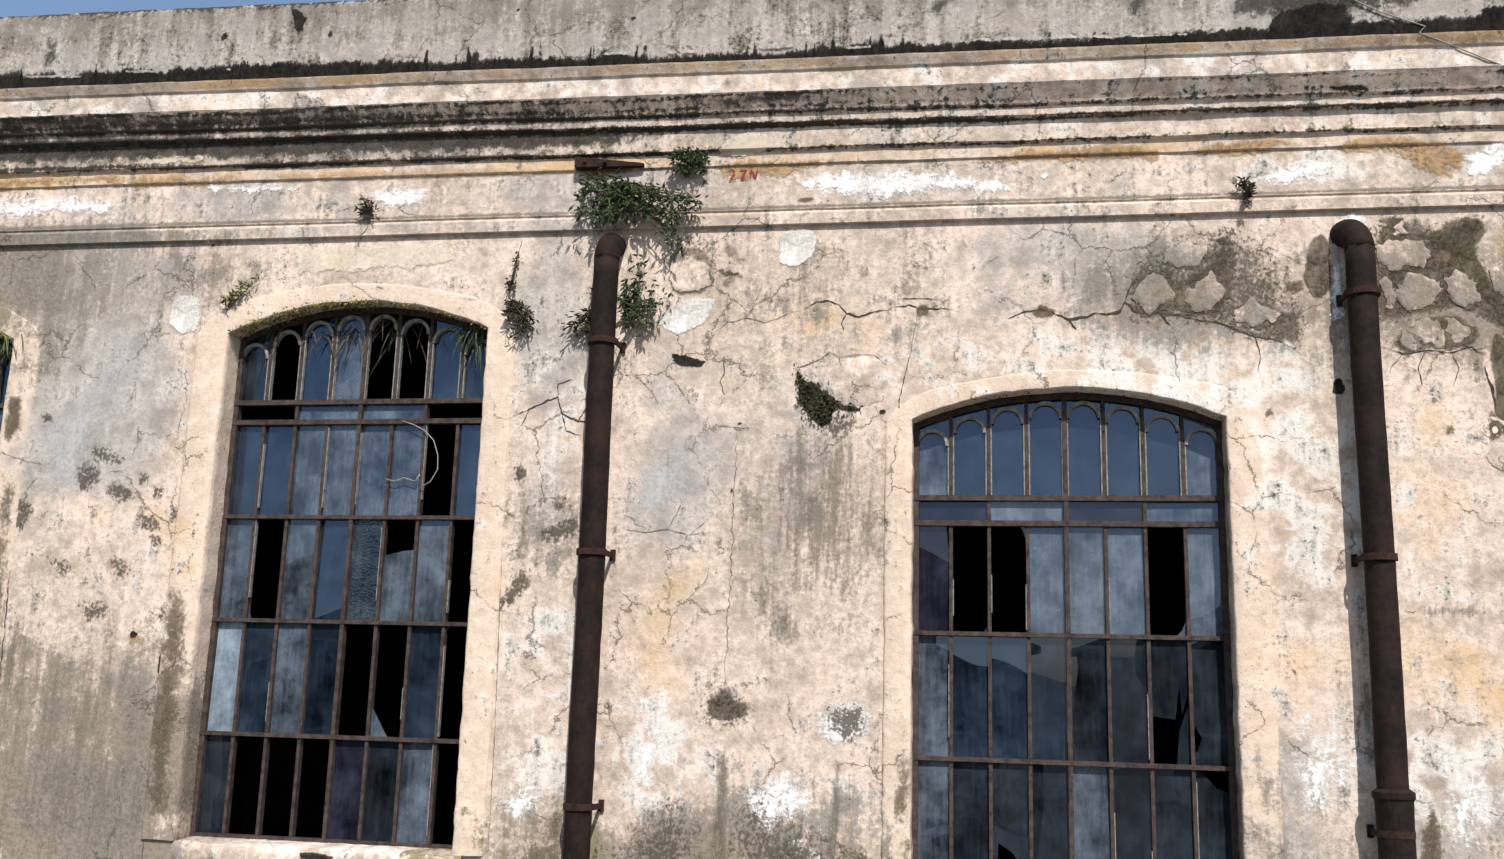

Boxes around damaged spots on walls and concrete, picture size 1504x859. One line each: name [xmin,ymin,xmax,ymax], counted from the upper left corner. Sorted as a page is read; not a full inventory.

water stain [0,0,1504,89]
crack [712,282,954,408]
flaking render [1126,226,1309,349]
flaking render [1369,213,1504,352]
water stain [1431,217,1504,432]
crack [514,379,586,436]
water stain [825,415,856,438]
water stain [77,600,110,622]
flaking render [700,682,750,726]
water stain [612,798,705,859]
water stain [728,771,867,859]
corrosion [1420,812,1442,859]